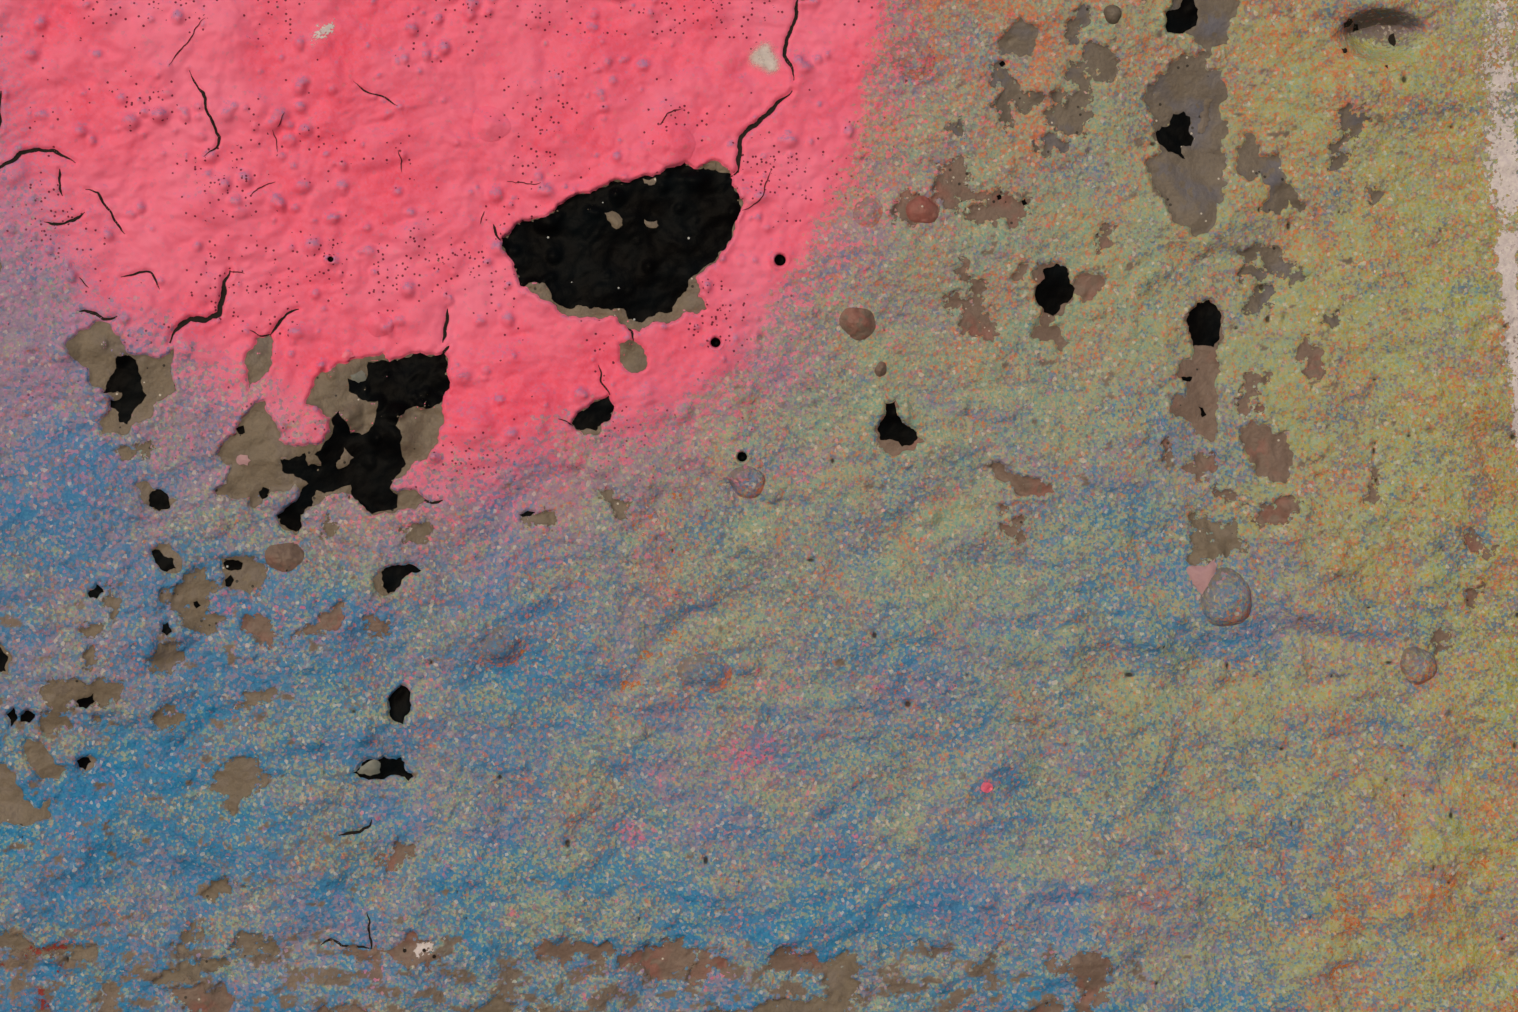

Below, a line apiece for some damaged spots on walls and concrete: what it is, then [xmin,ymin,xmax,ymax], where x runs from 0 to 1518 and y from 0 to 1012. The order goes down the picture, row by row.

crack [0,91,125,234]
crack [169,18,221,154]
crack [731,0,798,210]
peeling [1144,0,1306,237]
crack [79,271,160,321]
peeling [66,321,176,461]
crack [169,270,299,343]
peeling [215,335,450,544]
crack [441,309,449,353]
peeling [502,161,743,373]
peeling [1012,261,1105,352]
peeling [1161,300,1304,595]